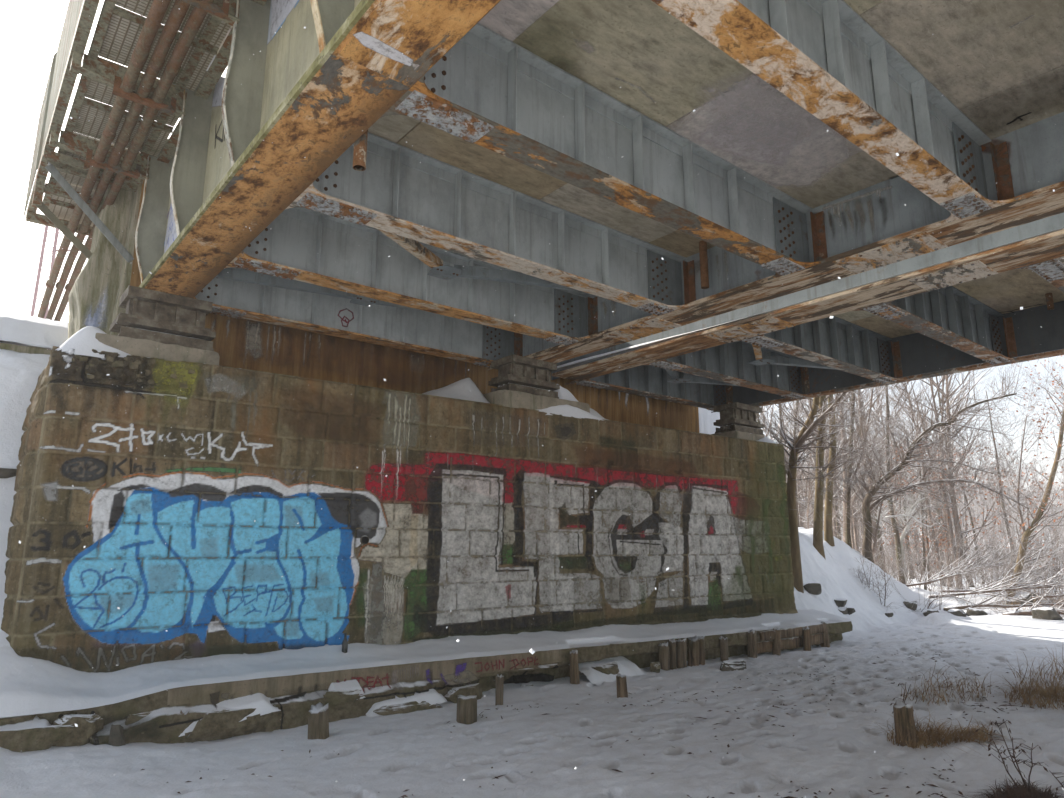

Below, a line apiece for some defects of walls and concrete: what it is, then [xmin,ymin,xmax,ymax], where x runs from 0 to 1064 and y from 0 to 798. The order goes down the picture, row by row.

spalling [62,355,195,389]
leakage [380,392,420,483]